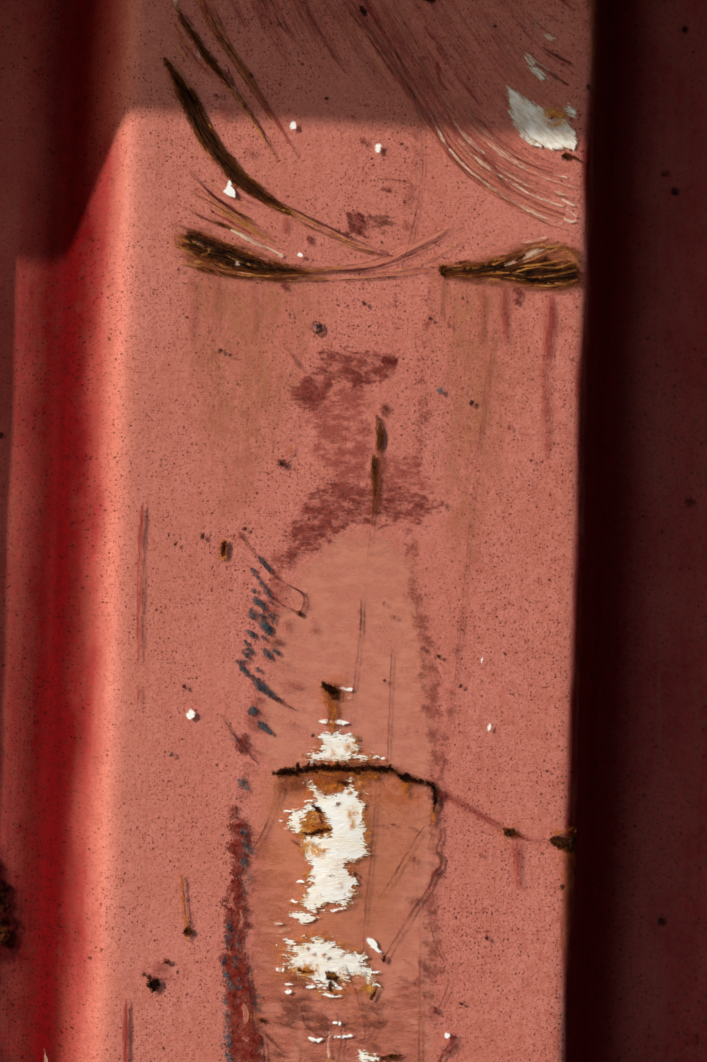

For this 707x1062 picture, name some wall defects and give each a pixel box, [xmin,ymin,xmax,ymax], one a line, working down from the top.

spalling [163,0,585,293]
corrosion [320,681,340,734]
corrosion [0,864,19,982]
peeling [218,814,286,1062]
peeling [273,719,409,1062]
corrosion [503,827,520,838]
corrosion [549,827,577,854]